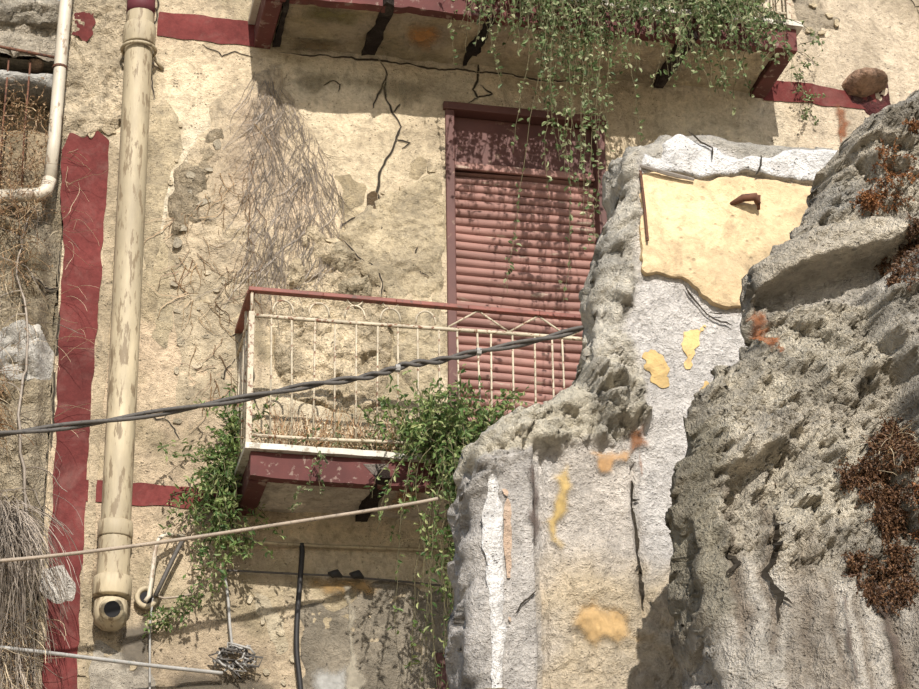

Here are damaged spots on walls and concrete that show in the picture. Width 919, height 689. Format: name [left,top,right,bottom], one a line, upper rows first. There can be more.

crack [202,44,253,58]
crack [279,52,592,297]
flaking render [639,134,838,310]
crack [684,285,733,326]
rust [749,313,784,352]
crack [630,469,645,611]